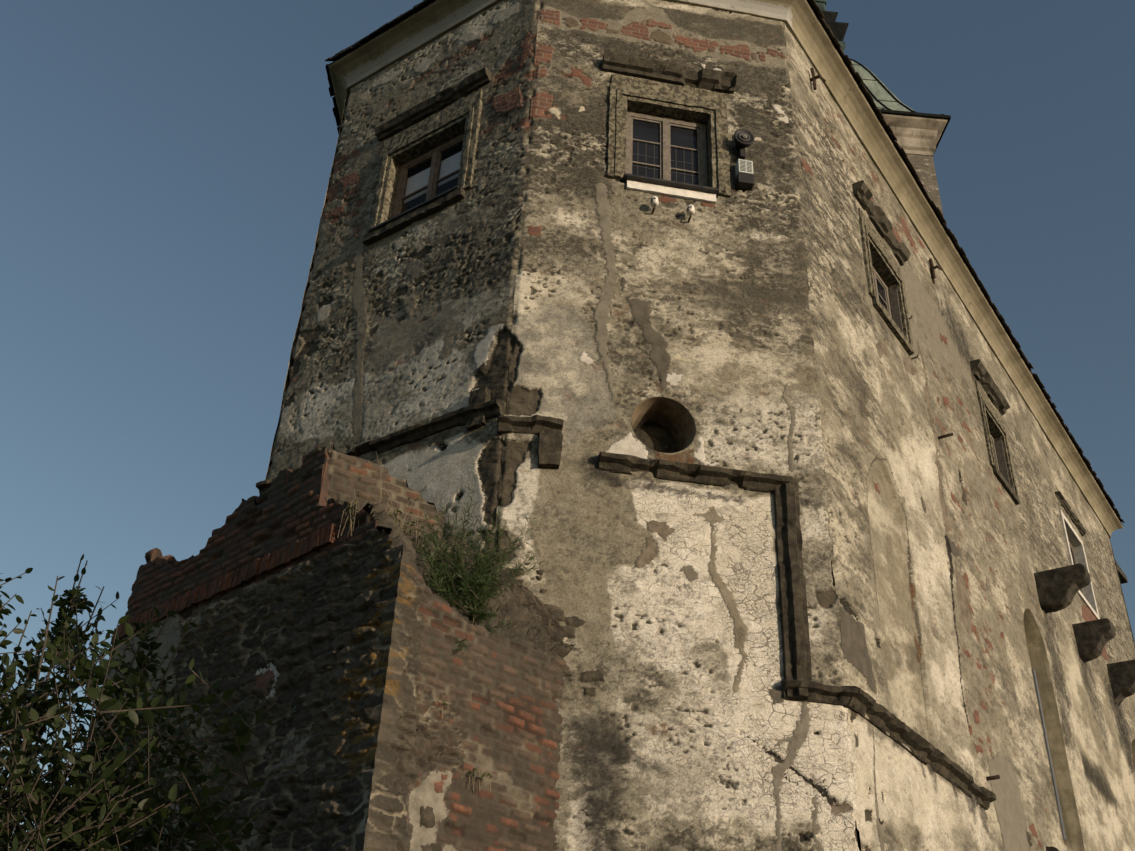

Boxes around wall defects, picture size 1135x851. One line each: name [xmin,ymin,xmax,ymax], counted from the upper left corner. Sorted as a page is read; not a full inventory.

spalling [470,323,542,417]
spalling [477,438,532,561]
water stain [582,461,689,494]
crack [693,506,748,694]
peeling [254,662,281,703]
peeling [408,770,458,851]
water stain [585,729,640,849]
crack [739,701,885,851]